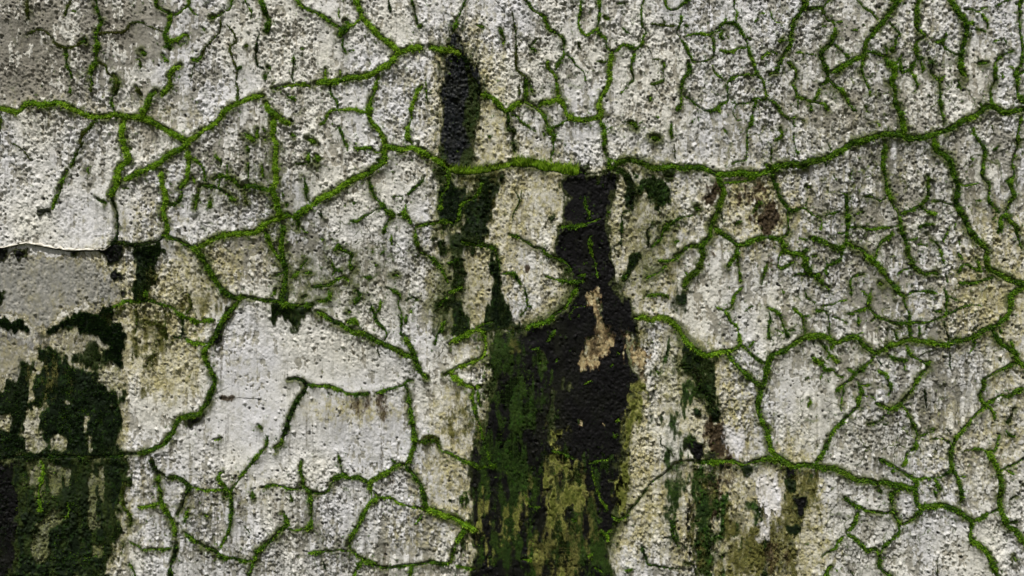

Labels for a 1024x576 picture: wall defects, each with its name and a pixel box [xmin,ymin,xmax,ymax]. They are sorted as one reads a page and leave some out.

crack [88,0,198,97]
crack [650,0,805,164]
crack [935,0,988,77]
crack [350,180,483,283]
crack [971,116,1023,249]
leakage [0,290,30,334]
crack [317,288,428,379]
leakage [422,22,782,576]
leakage [0,305,132,576]
crack [138,437,269,549]
crack [184,320,497,576]
crack [868,345,936,468]